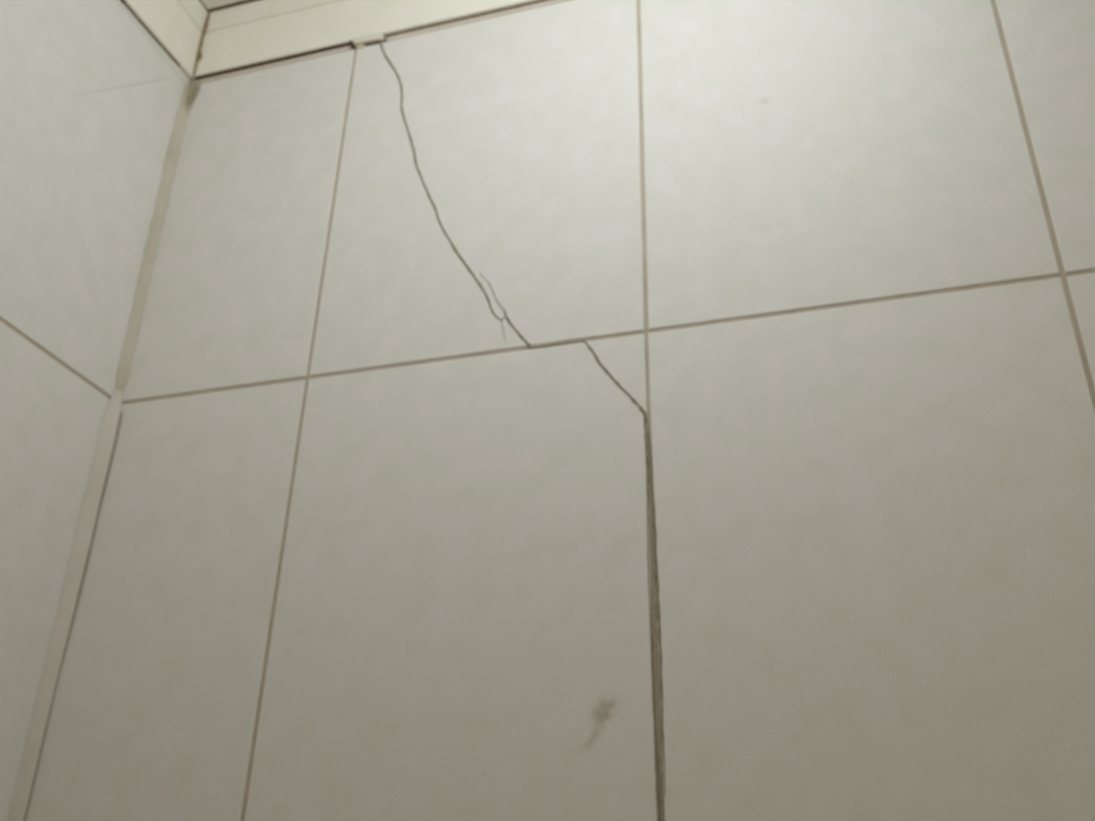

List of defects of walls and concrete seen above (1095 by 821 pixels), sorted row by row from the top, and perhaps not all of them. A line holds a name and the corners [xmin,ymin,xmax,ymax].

crack [349,33,666,821]